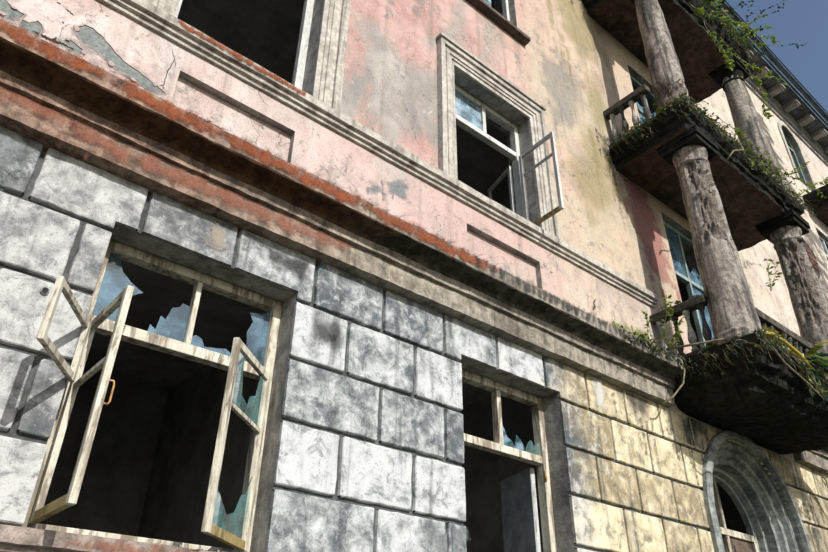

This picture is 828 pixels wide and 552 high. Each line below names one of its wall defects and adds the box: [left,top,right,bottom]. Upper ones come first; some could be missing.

flaking render [0,0,45,37]
corrosion [0,20,105,76]
flaking render [60,24,167,95]
corrosion [178,20,306,95]
corrosion [0,87,128,163]
corrosion [113,78,497,271]